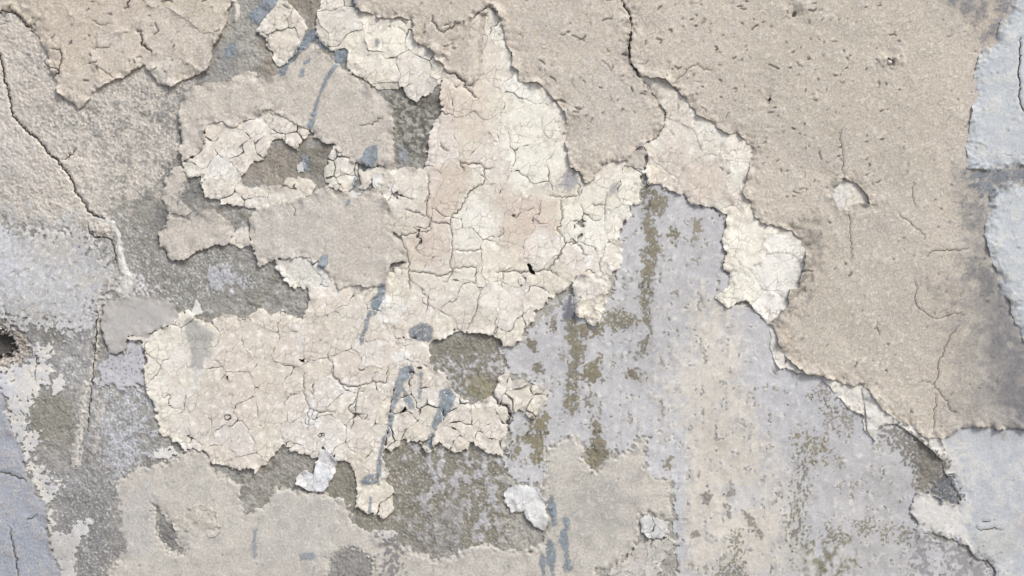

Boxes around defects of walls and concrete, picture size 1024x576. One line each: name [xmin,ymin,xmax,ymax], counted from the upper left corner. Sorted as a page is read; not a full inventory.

crack [0,55,118,261]
peeling [157,0,805,347]
crack [400,148,607,333]
crack [621,2,710,135]
flaking render [385,0,1024,576]
crack [903,182,966,253]
peeling [0,212,120,576]
crack [303,371,388,429]
peeling [94,256,674,576]